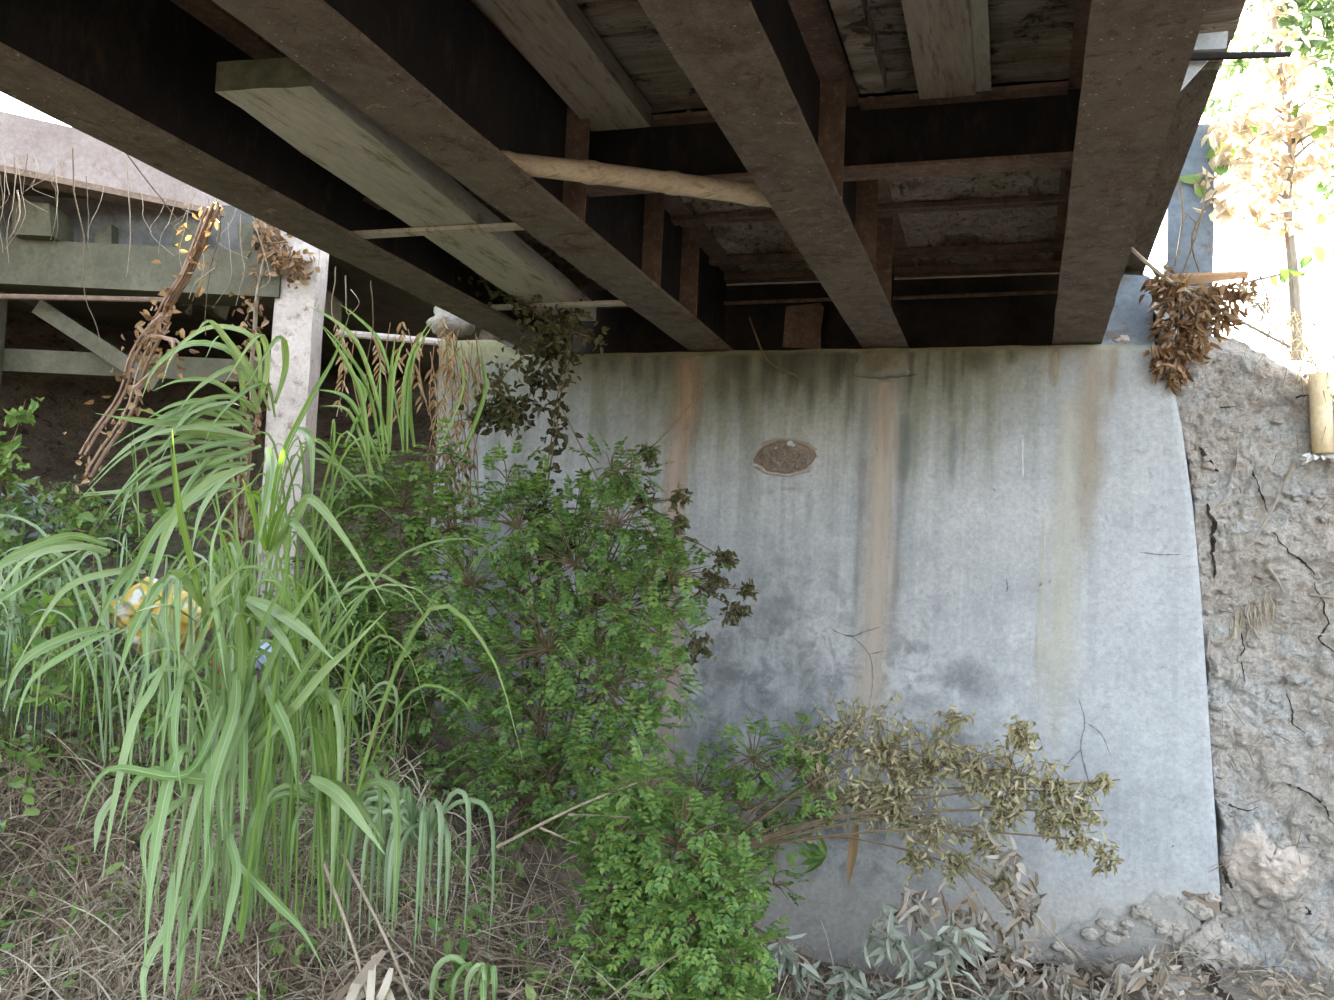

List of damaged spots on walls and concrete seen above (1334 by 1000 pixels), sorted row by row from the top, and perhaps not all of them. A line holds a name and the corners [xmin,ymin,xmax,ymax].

corrosion [666,358,704,537]
spalling [752,438,818,477]
crack [1069,700,1111,803]